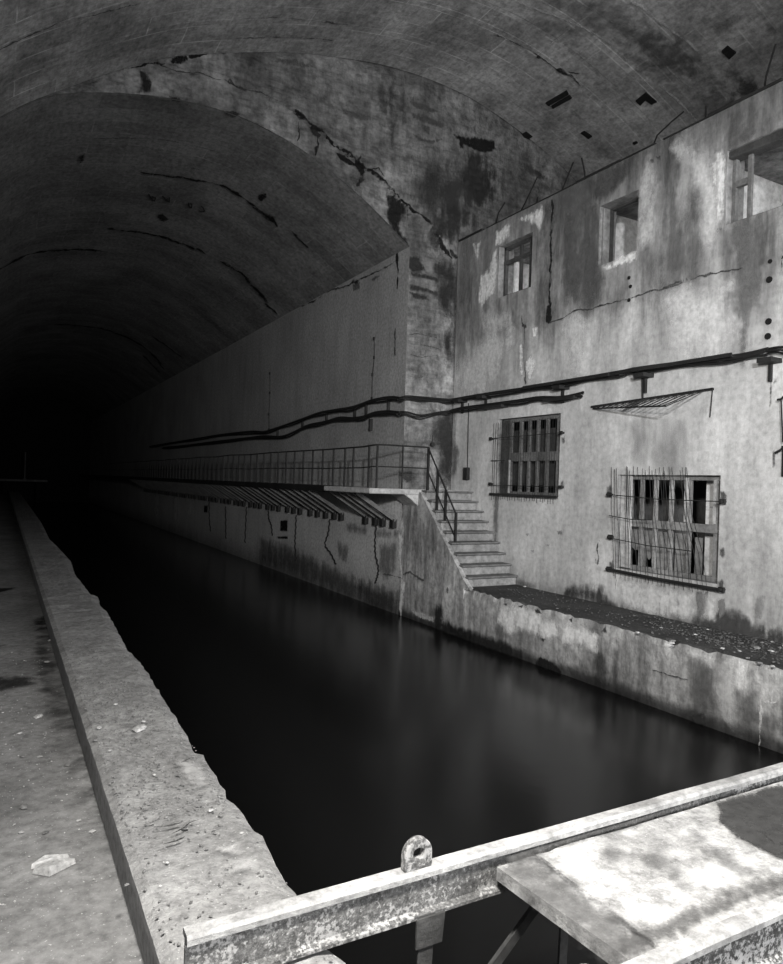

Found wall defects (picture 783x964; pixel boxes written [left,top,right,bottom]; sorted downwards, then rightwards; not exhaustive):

crack [0,4,137,50]
crack [497,34,579,84]
crack [97,138,308,248]
crack [295,109,458,259]
water stain [418,155,495,244]
crack [108,228,399,314]
crack [521,200,741,383]
water stain [435,605,617,684]
water stain [565,586,616,606]
water stain [690,661,716,705]
water stain [693,599,783,643]
water stain [716,784,783,858]